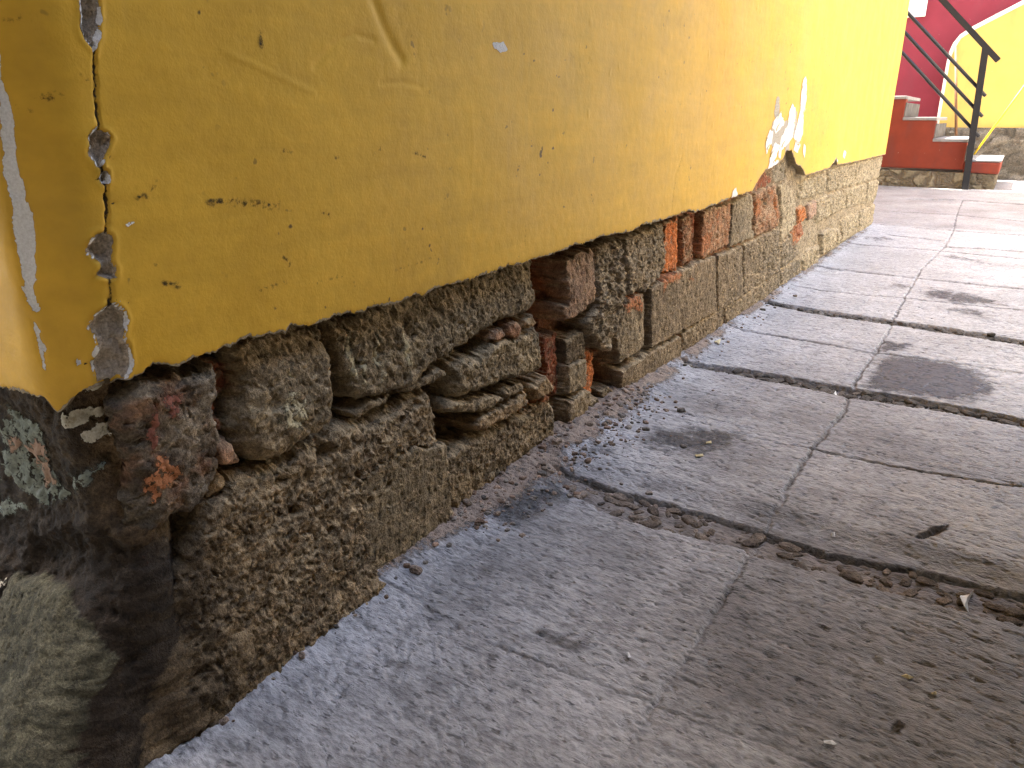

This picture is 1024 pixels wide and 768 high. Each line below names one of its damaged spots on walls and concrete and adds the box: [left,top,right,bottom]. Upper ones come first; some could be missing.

crack [79,0,134,384]
peeling [0,55,885,443]
leakage [865,341,992,399]